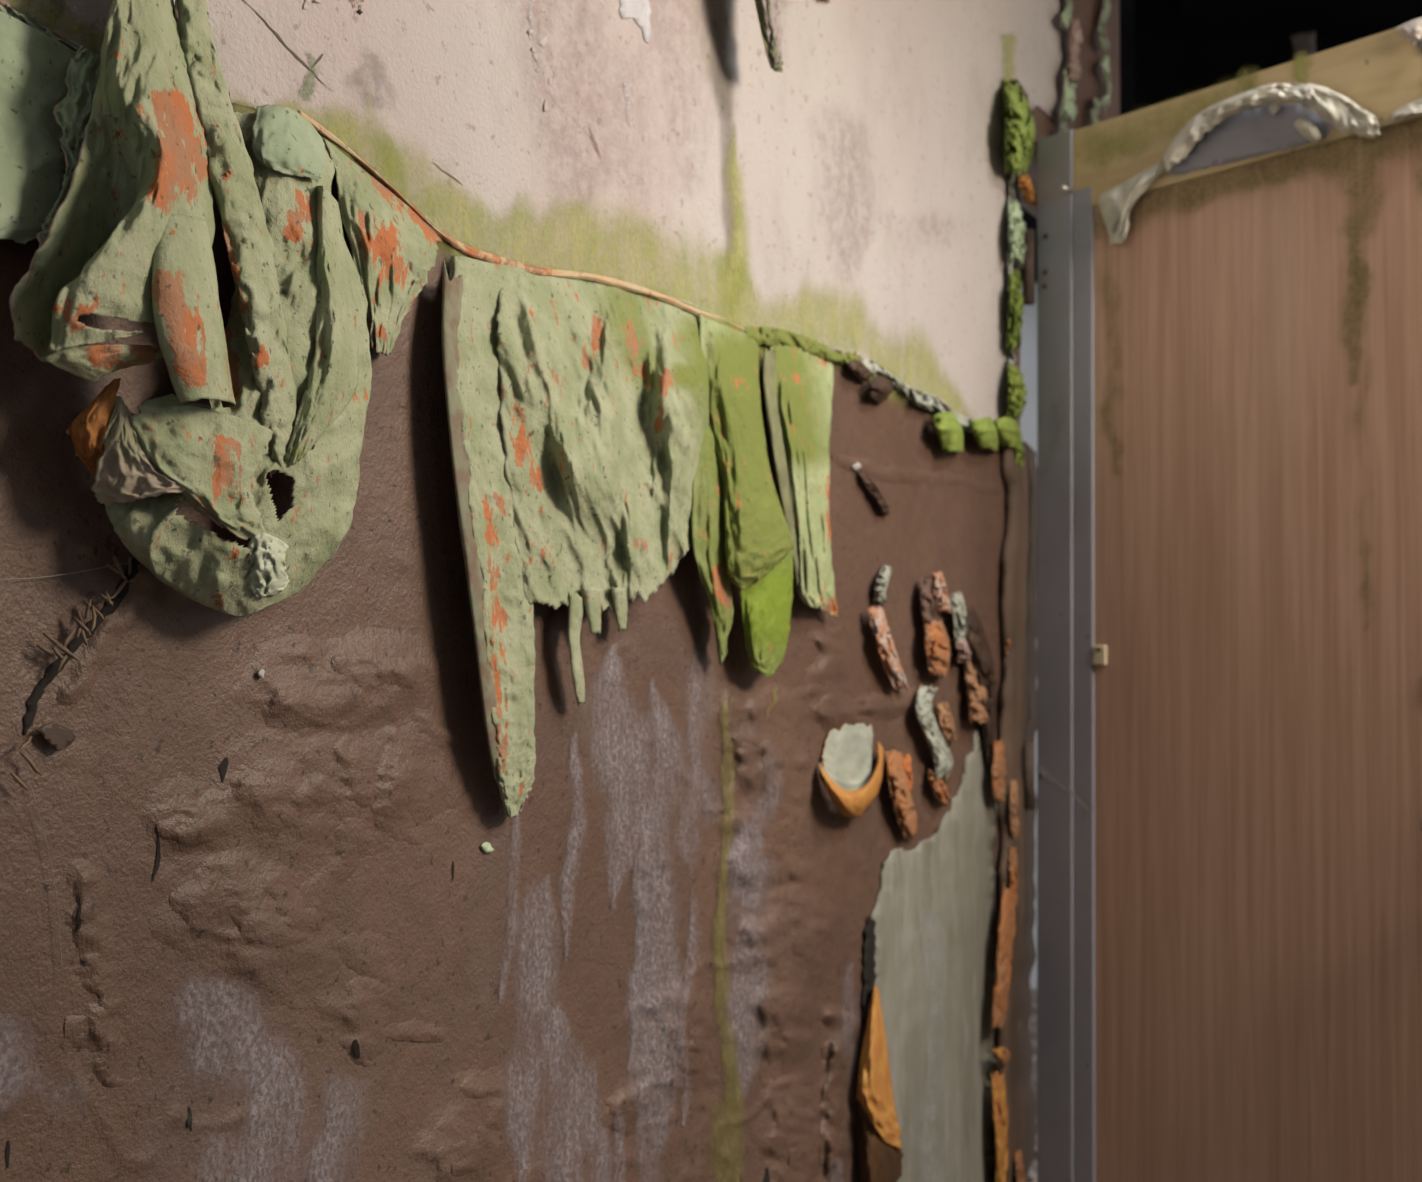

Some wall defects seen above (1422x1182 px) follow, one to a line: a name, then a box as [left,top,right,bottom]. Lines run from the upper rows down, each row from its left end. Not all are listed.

peeling [1058,0,1112,134]
peeling [1395,17,1422,45]
peeling [1098,83,1422,246]
peeling [1003,78,1037,420]
peeling [0,0,838,818]
peeling [855,469,890,516]
spalling [819,565,1027,1182]
efflorescence [181,982,303,1182]
efflorescence [310,1086,351,1182]